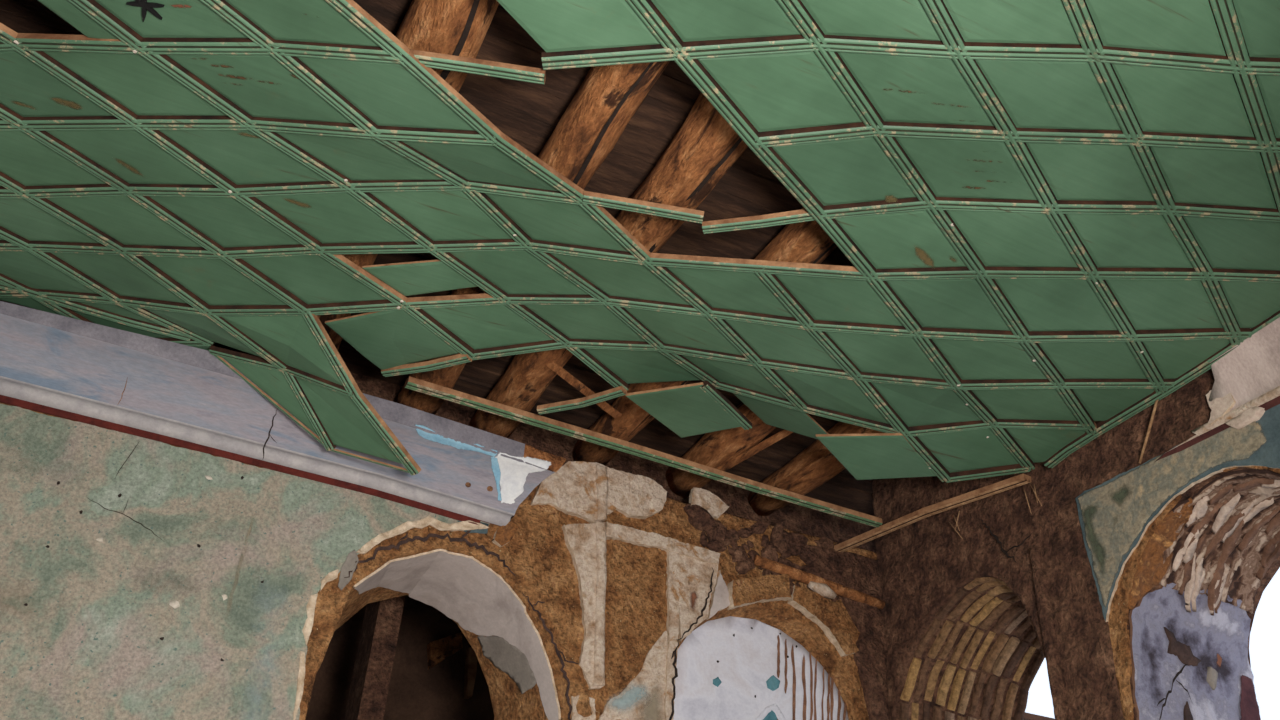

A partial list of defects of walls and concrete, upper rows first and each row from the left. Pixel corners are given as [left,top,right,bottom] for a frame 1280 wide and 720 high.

crack [263,410,277,458]
flaking render [293,375,1280,720]